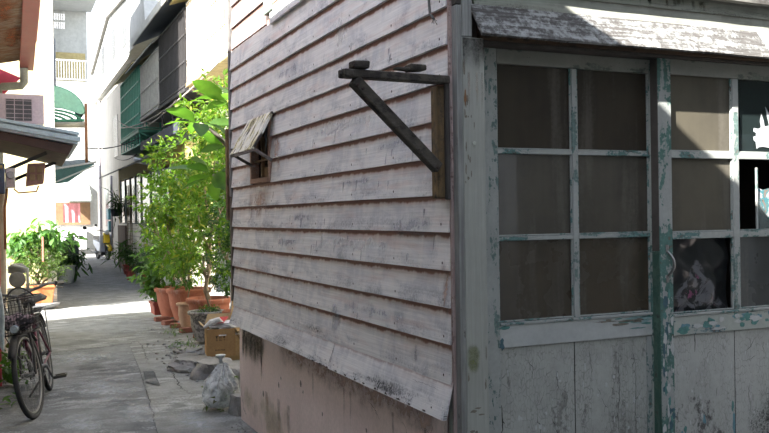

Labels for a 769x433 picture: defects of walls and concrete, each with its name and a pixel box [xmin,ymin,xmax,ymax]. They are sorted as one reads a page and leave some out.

crack [54,342,190,433]
leakage [242,329,262,375]
leakage [289,350,431,428]
peeling [595,315,653,329]
peeling [663,289,769,433]